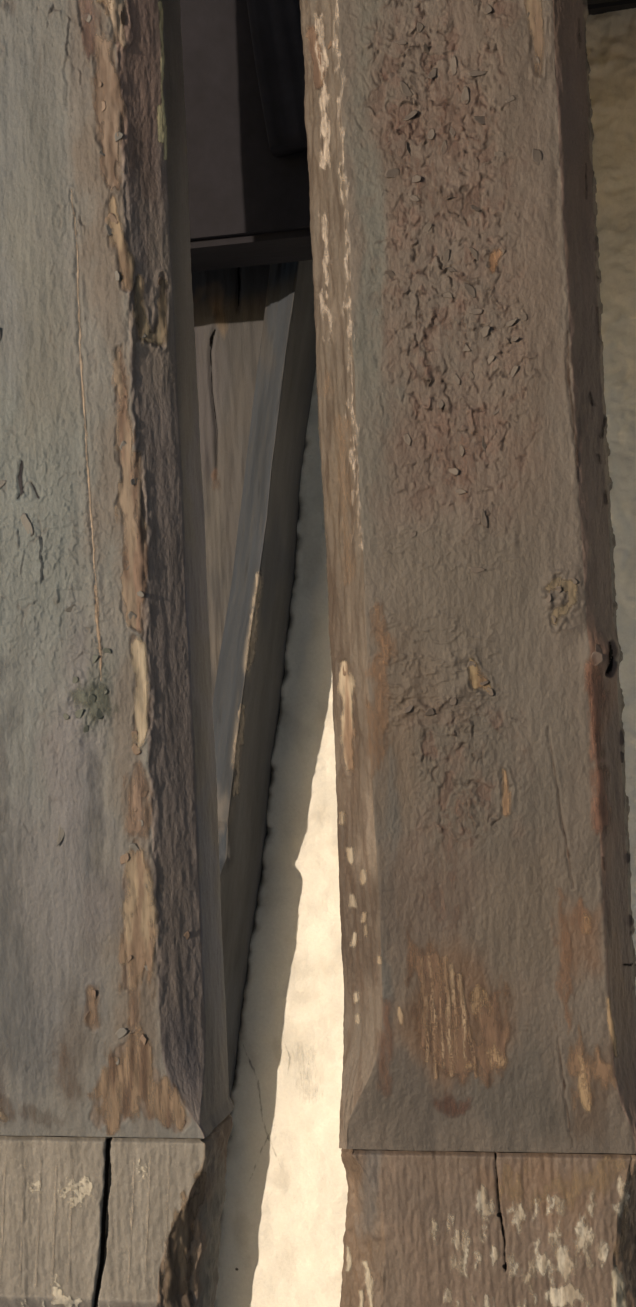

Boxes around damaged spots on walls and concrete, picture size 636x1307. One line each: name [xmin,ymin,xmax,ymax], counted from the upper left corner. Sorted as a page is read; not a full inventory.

peeling [78,0,167,344]
peeling [113,351,158,991]
peeling [88,1025,186,1136]
peeling [398,935,510,1086]
peeling [567,998,617,1111]
peeling [17,1159,93,1307]
crack [94,1139,110,1307]
peeling [346,1246,373,1307]
crack [494,1153,507,1272]
peeling [431,1185,627,1307]
peeling [613,1177,630,1217]